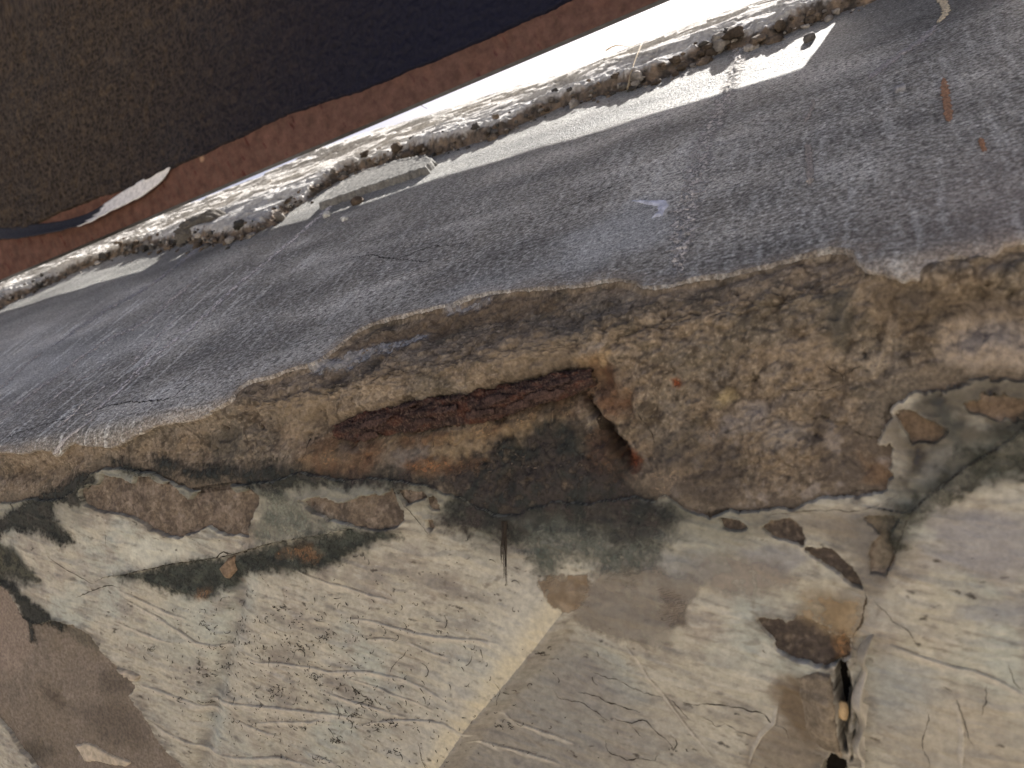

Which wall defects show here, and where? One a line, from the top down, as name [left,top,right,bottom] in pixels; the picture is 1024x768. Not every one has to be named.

spalling [0,245,1024,586]
crack [826,753,847,768]